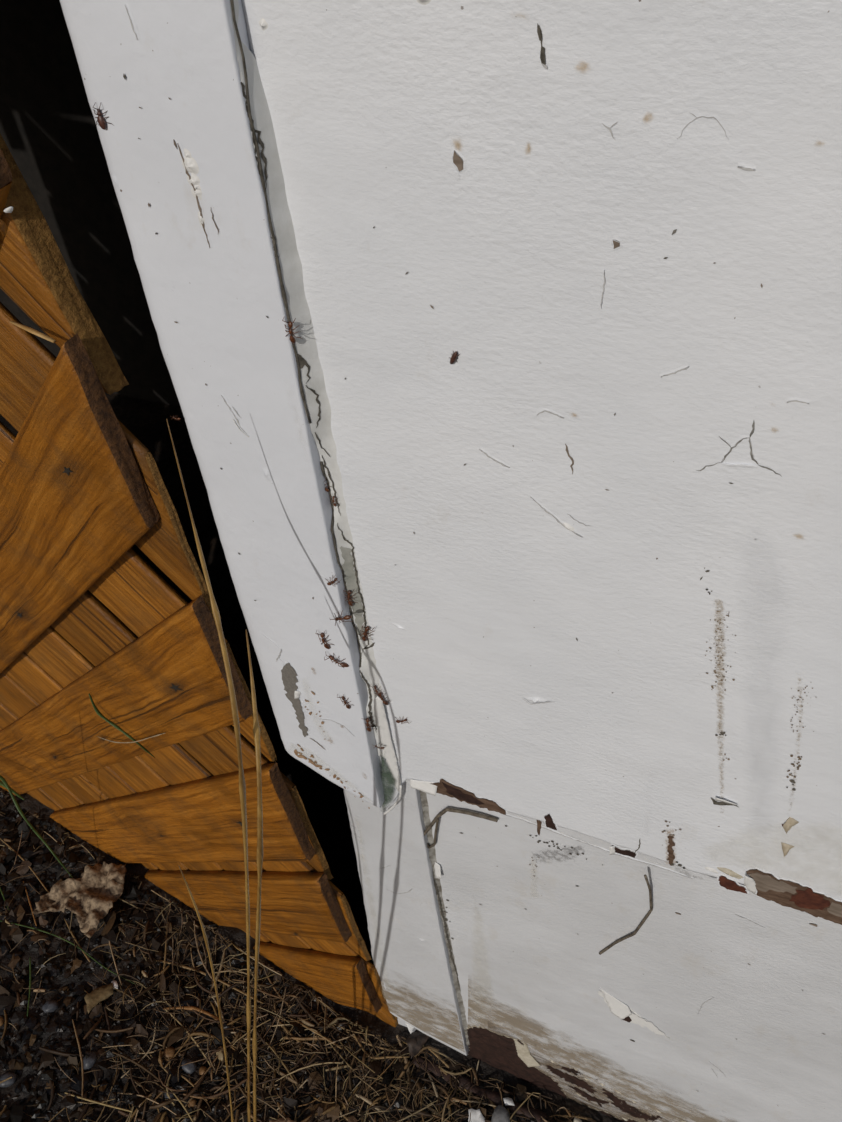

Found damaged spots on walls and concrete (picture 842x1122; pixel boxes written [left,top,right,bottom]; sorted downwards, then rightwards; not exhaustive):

crack [230,0,377,736]
crack [221,394,249,437]
crack [696,421,782,477]
peeling [262,634,324,749]
peeling [374,696,508,815]
peeling [705,867,842,927]
peeling [598,988,671,1040]